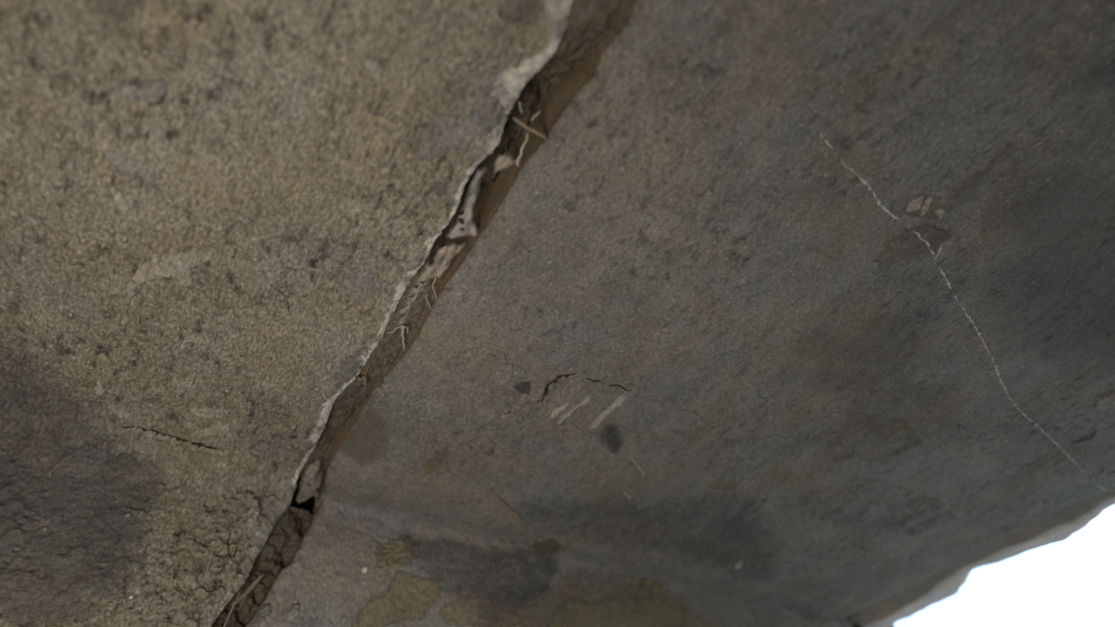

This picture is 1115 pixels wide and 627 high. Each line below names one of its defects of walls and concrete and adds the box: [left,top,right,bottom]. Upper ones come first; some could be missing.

crack [820,134,1108,491]
crack [504,373,631,415]
crack [122,426,225,451]